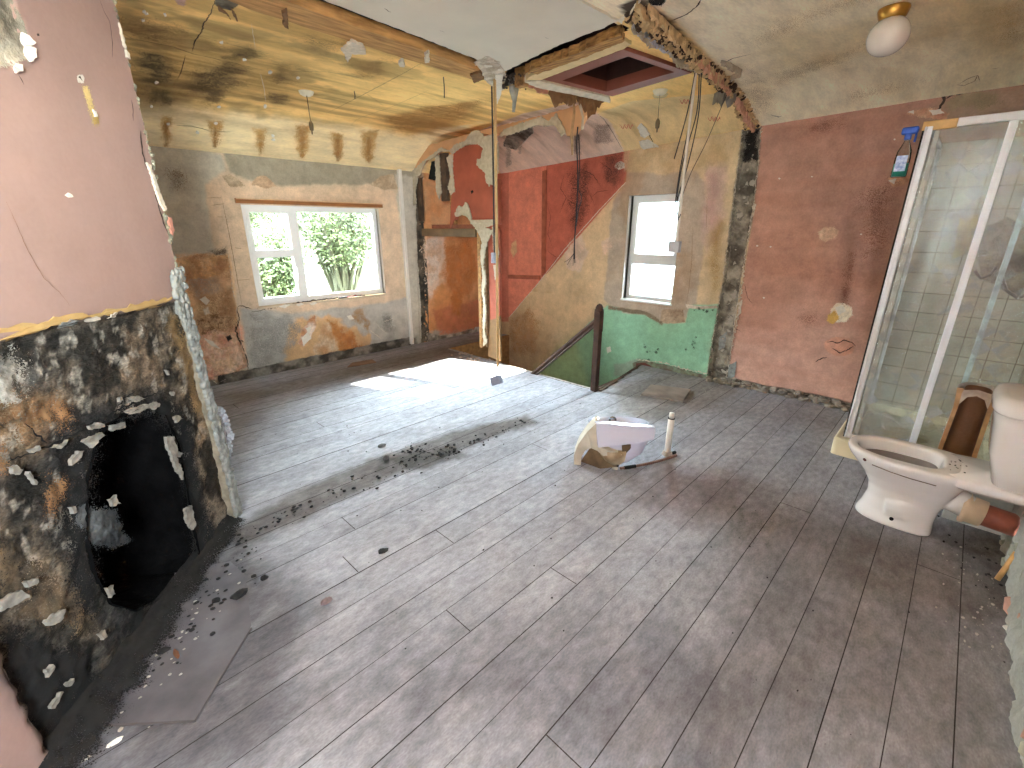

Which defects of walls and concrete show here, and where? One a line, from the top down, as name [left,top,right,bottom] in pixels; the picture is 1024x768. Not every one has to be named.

crack [100,1,267,101]
leakage [120,10,409,147]
leakage [250,127,268,154]
leakage [294,123,314,159]
leakage [326,131,345,162]
flaking render [685,128,853,412]
peeling [0,297,173,410]
peeling [26,422,126,466]
peeling [183,505,196,530]
peeling [0,578,39,612]
peeling [42,609,66,626]
peeling [47,678,74,709]